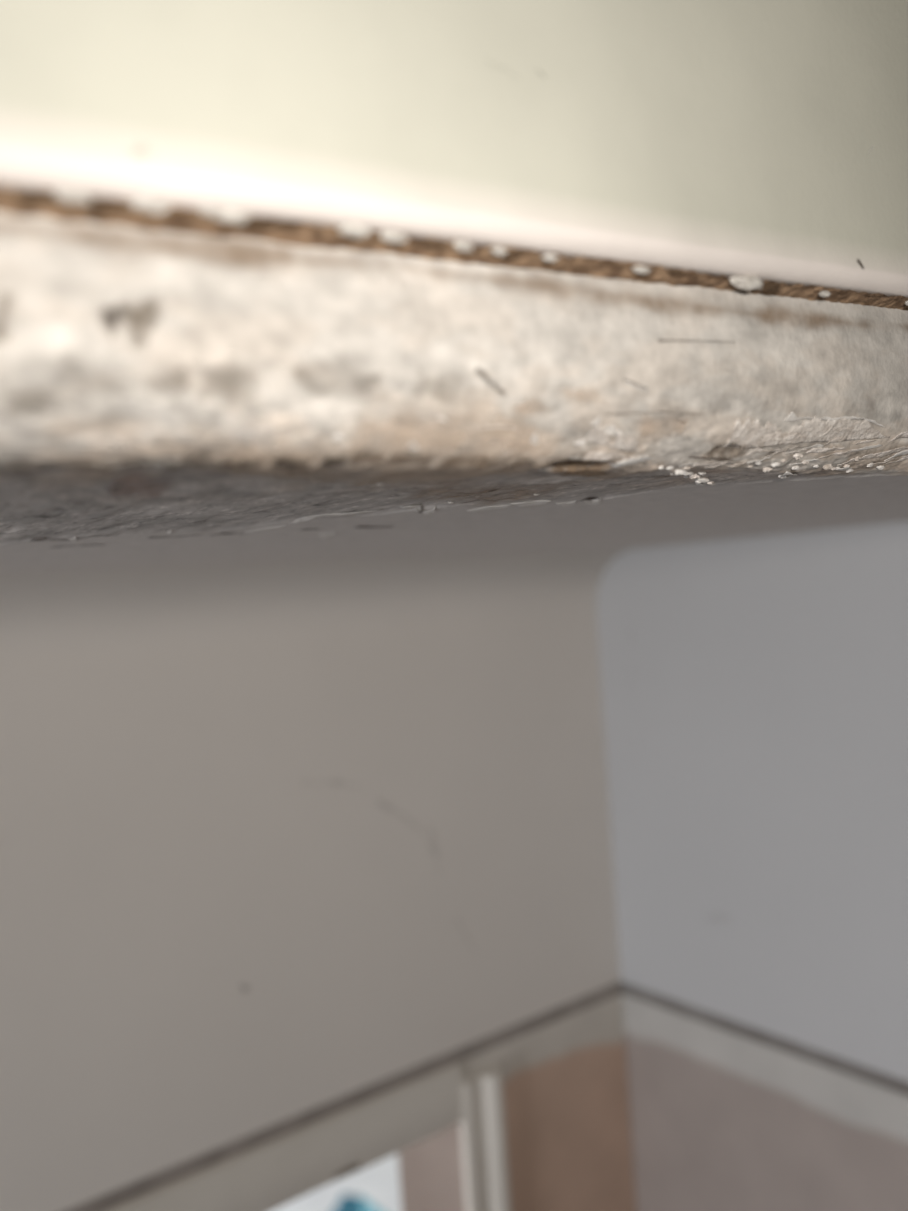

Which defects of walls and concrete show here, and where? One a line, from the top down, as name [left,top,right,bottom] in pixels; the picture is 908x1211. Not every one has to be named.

spalling [0,186,908,311]
leakage [105,305,155,331]
leakage [227,428,538,497]
peeling [553,416,654,477]
peeling [679,412,908,476]
spalling [401,489,602,515]